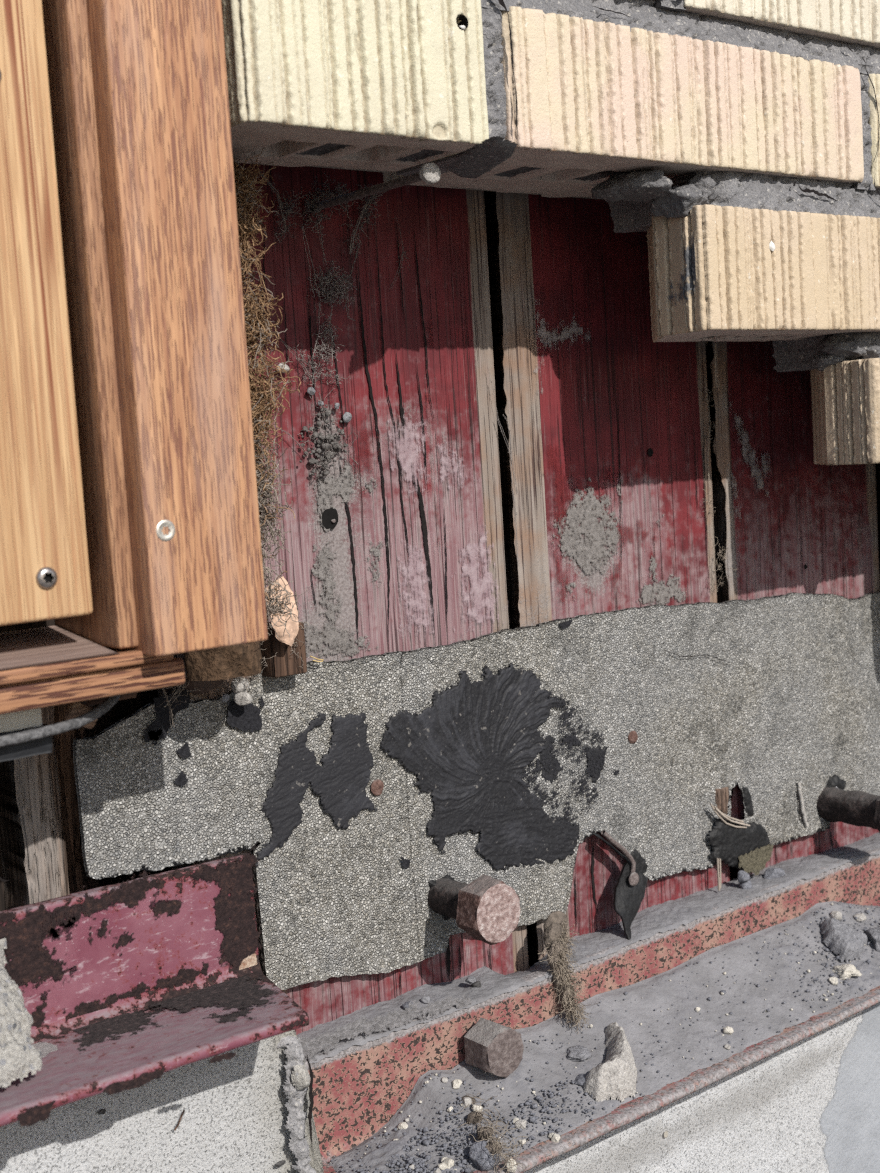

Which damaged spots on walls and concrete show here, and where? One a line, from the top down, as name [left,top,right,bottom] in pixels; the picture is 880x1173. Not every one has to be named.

peeling [304,539,379,661]
corrosion [0,853,281,1054]
corrosion [209,1052,236,1063]
corrosion [98,1068,166,1095]
corrosion [18,1100,56,1127]